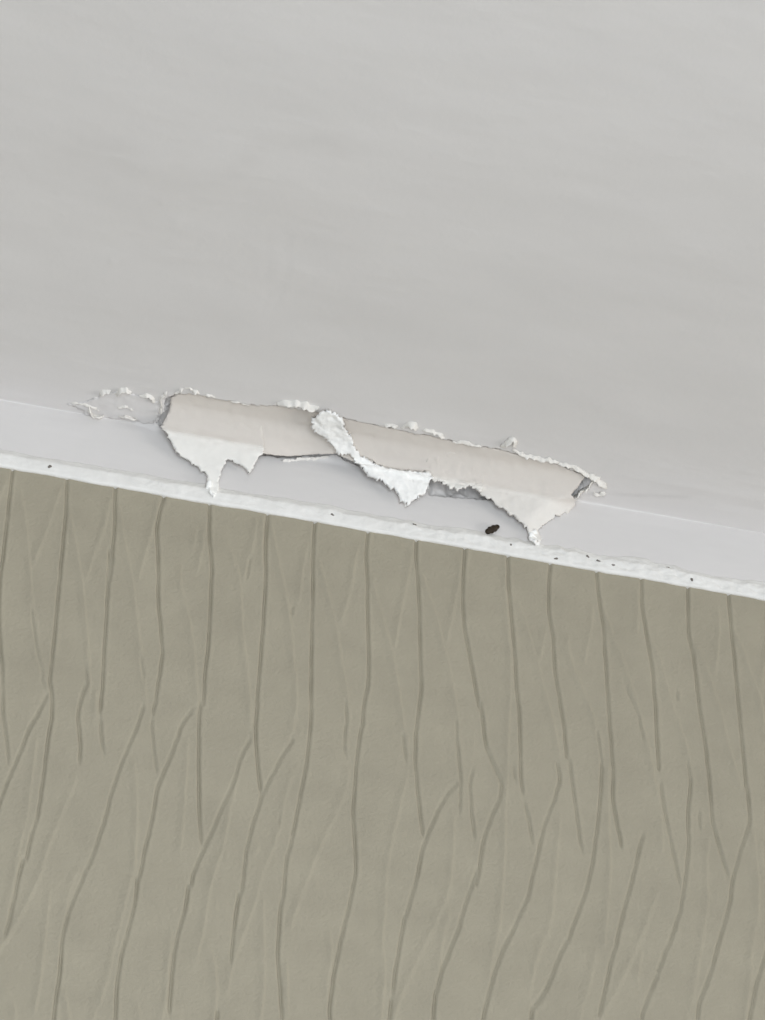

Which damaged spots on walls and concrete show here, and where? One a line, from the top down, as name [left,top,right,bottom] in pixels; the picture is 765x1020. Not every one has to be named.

peeling [67,387,607,545]